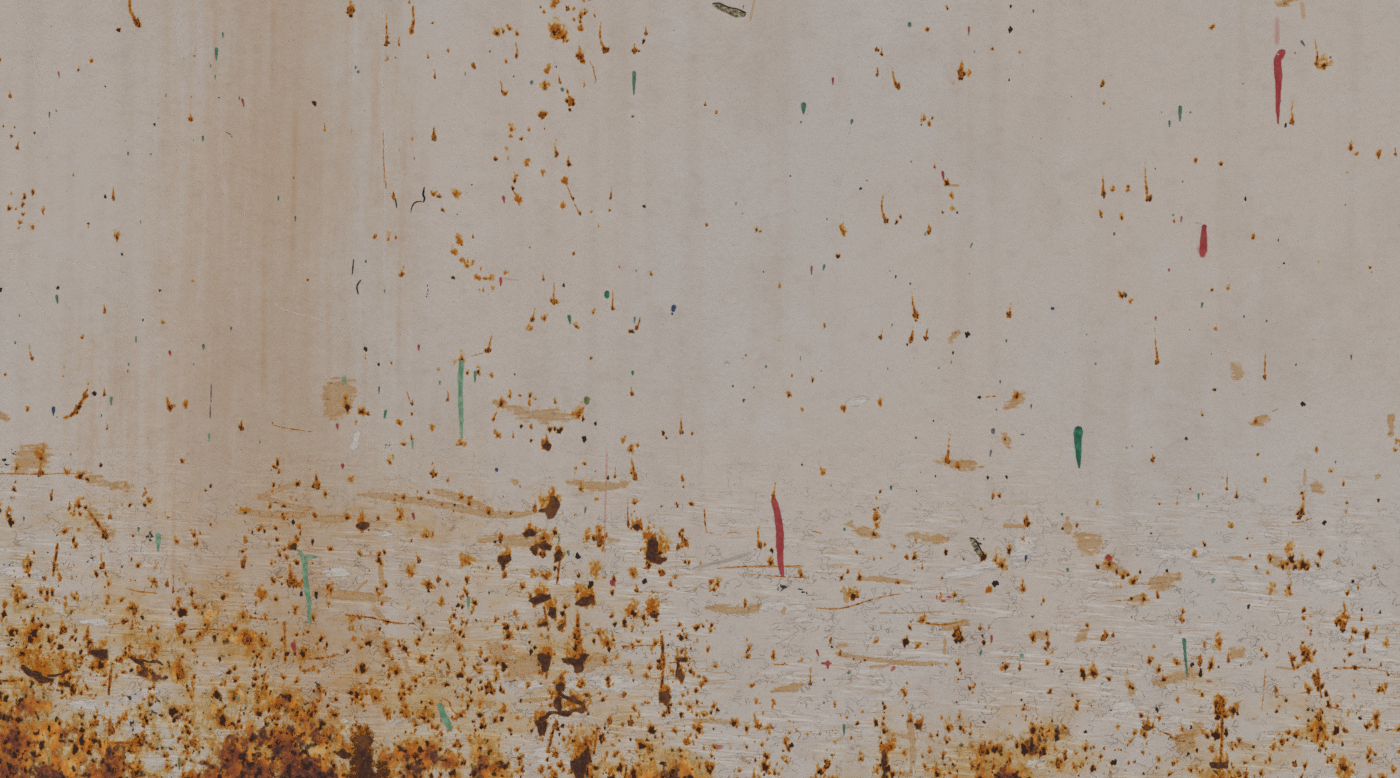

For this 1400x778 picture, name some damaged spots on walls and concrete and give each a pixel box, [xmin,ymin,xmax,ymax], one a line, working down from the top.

corrosion [539,0,610,79]
corrosion [542,65,575,111]
corrosion [493,149,599,227]
corrosion [1099,168,1156,218]
corrosion [906,298,929,346]
corrosion [574,436,639,500]